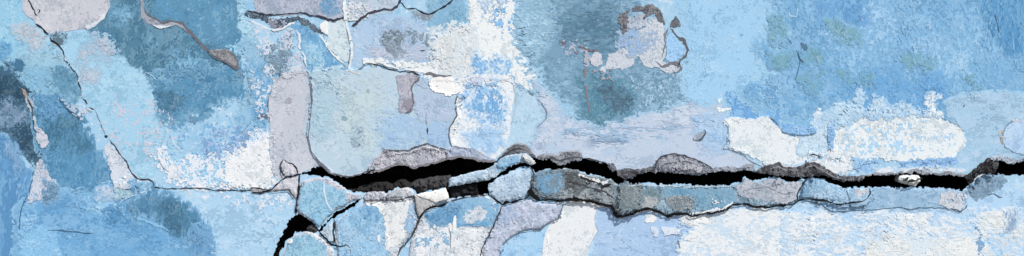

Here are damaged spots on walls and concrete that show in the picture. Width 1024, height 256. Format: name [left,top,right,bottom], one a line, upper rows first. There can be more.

peeling [140,0,197,41]
peeling [632,4,665,24]
peeling [165,46,204,76]
peeling [592,10,659,73]
peeling [666,30,687,62]
peeling [629,75,669,109]
crack [991,160,1024,176]
crack [110,140,976,256]